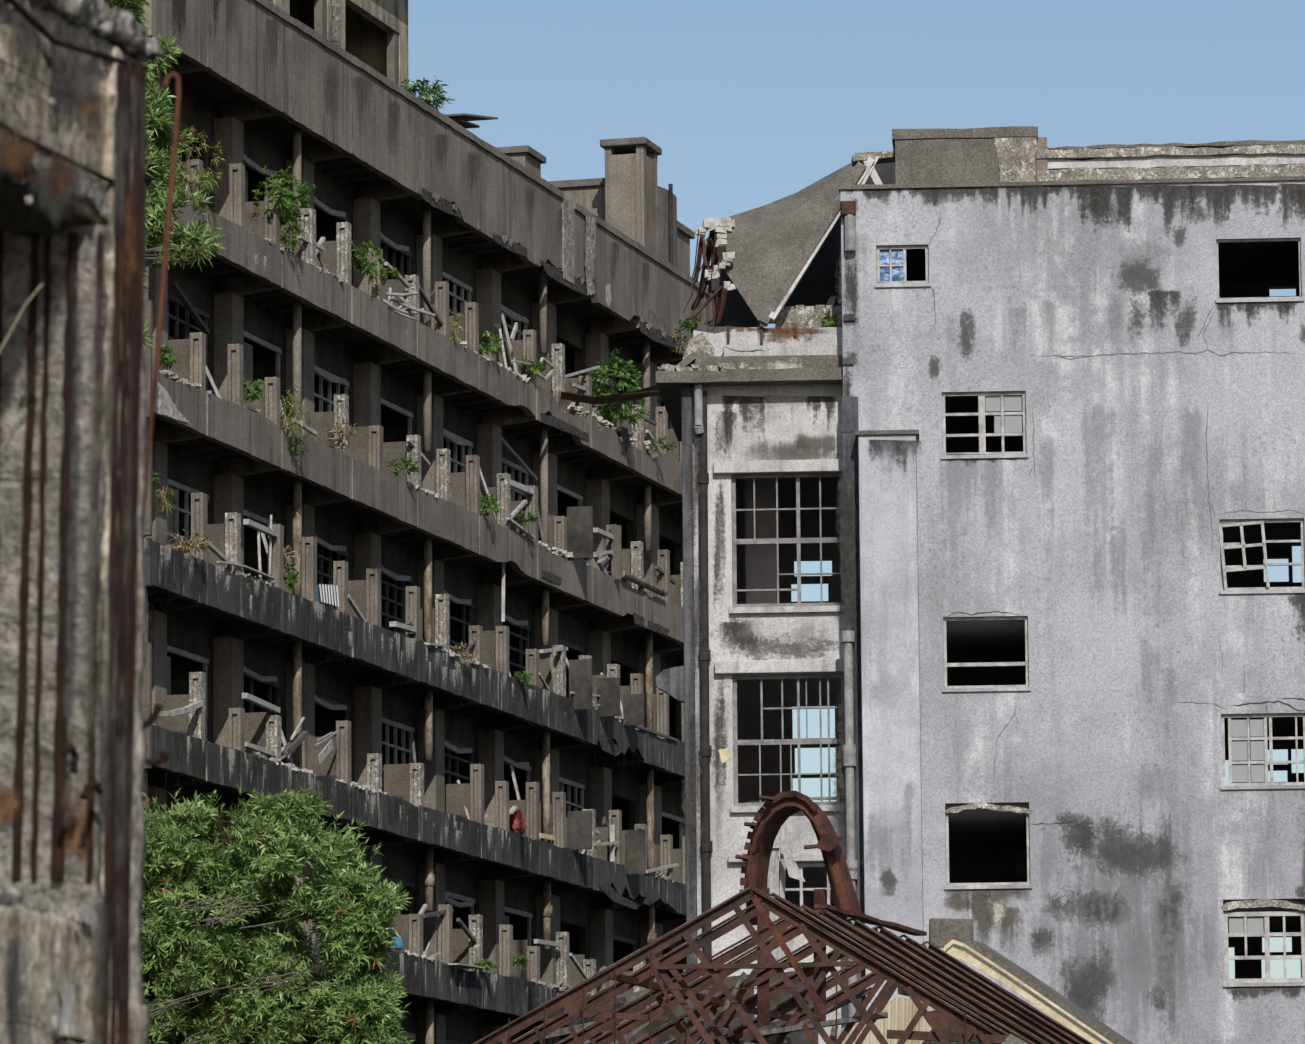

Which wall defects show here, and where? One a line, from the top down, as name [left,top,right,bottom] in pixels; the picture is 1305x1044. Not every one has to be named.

spalling [24,148,52,172]
spalling [72,169,109,220]
rust [54,45,144,299]
crack [1034,306,1295,360]
leakage [1217,298,1294,325]
leakage [716,396,765,452]
leakage [758,354,856,460]
rust [56,272,132,872]
leakage [833,461,861,850]
rust [0,784,18,824]
spalling [599,882,640,909]
flaking render [52,979,74,1044]